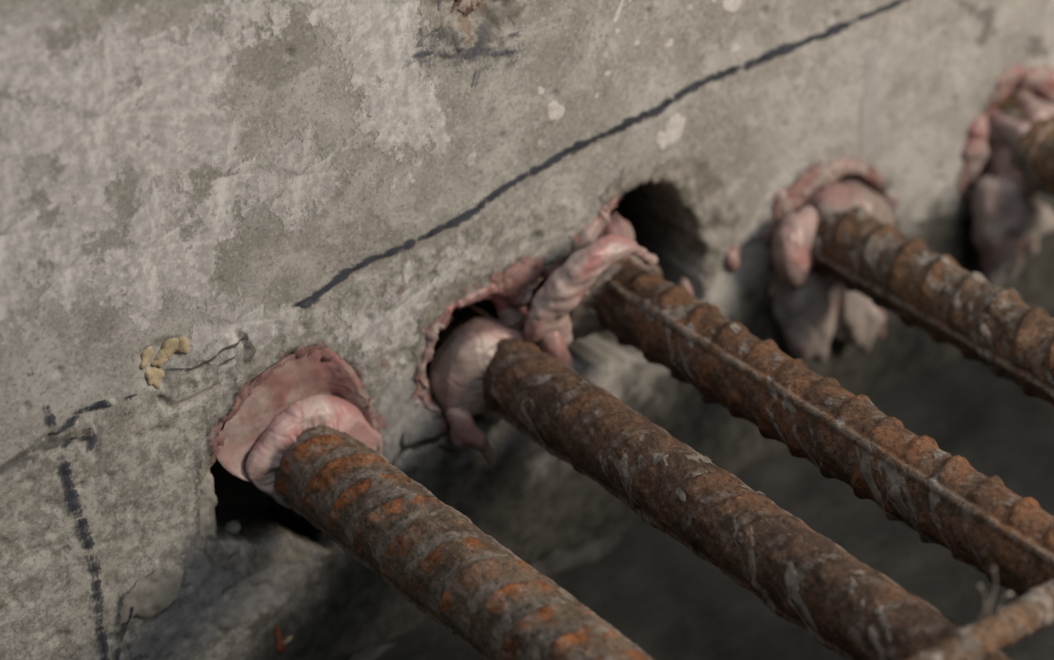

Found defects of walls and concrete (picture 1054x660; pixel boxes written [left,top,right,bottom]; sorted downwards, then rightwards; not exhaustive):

efflorescence [0,0,480,384]
spalling [411,247,573,369]
spalling [482,154,1054,660]
spalling [982,85,1054,197]
spalling [196,425,653,660]